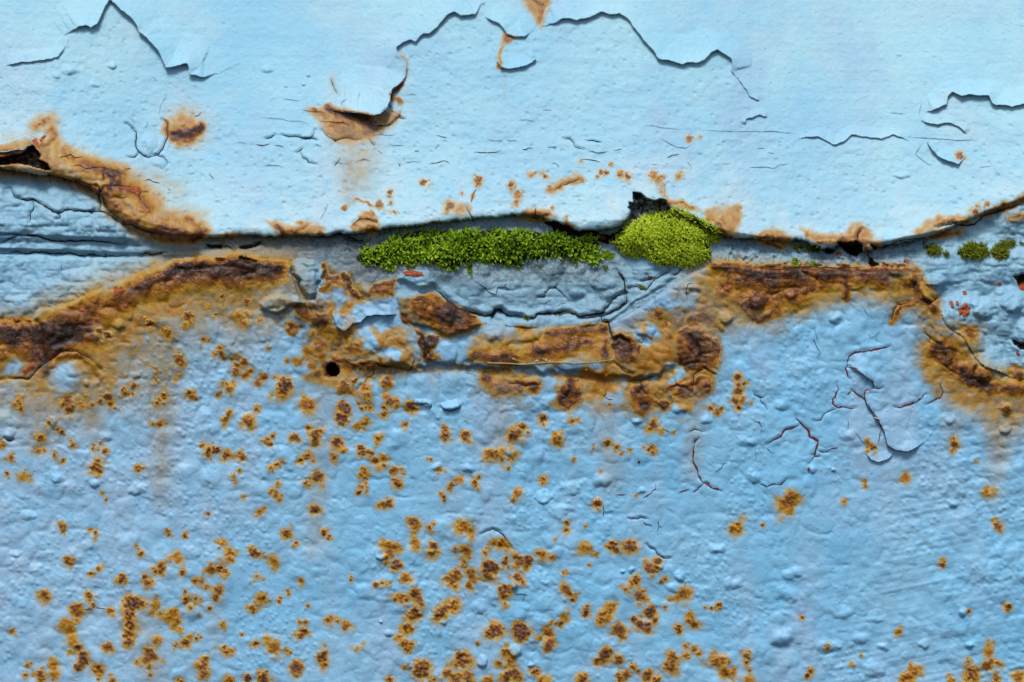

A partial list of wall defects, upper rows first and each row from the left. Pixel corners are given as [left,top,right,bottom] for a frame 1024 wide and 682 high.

peeling [6,0,239,77]
rust [308,81,405,178]
peeling [317,0,751,125]
peeling [922,79,1024,133]
crack [318,210,374,242]
spalling [628,192,670,224]
crack [757,203,1022,270]
peeling [333,299,398,331]
rust [0,111,1024,520]
crack [753,274,958,463]
rust [22,538,311,682]
rust [372,517,755,682]